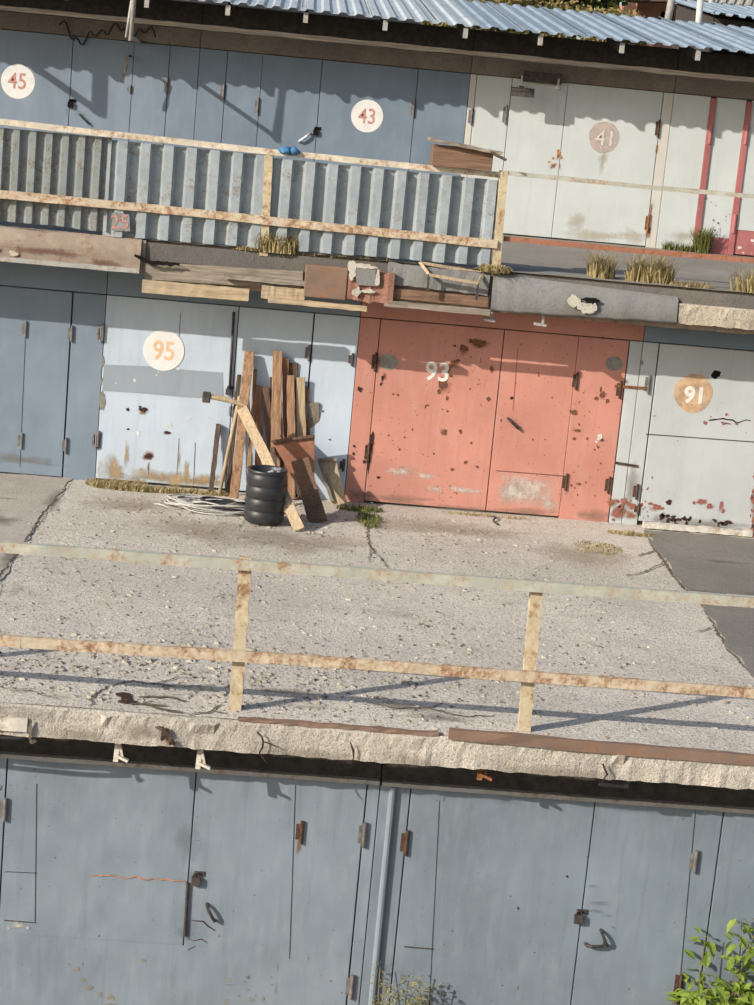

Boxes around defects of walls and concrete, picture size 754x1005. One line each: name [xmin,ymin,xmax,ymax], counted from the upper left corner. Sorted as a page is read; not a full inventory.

crack [0,480,72,574]
crack [365,521,387,566]
peeling [611,477,733,527]
crack [626,538,754,677]